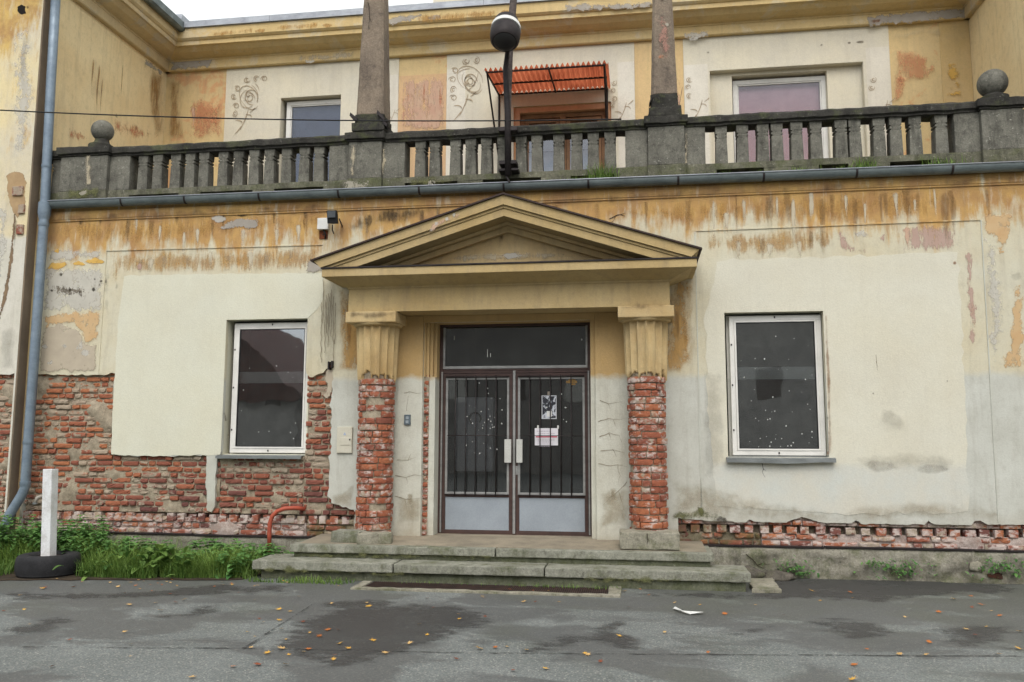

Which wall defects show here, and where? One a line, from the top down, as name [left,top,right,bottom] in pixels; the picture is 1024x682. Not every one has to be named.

flaking render [0,172,27,262]
water stain [129,252,311,270]
water stain [732,233,808,255]
peeling [903,226,953,250]
peeling [954,253,977,343]
peeling [985,214,1012,253]
peeling [1004,285,1024,368]
flaking render [23,226,396,536]
flaking render [0,375,14,532]
crack [598,400,627,509]
flaking render [627,376,1024,550]